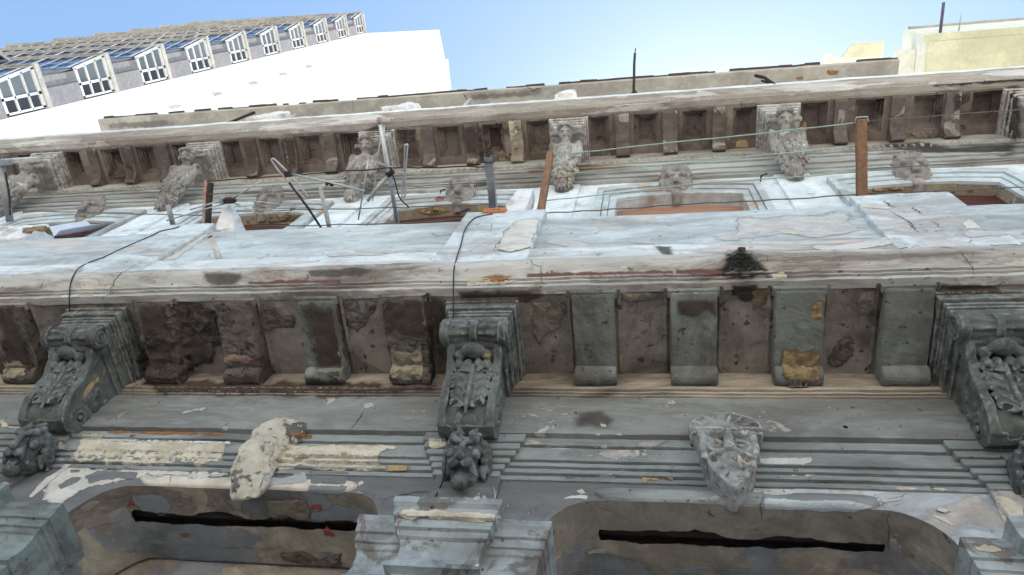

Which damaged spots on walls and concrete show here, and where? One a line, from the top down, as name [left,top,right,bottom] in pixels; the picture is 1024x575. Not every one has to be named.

crack [884,200,974,273]
leakage [205,273,241,285]
peeling [136,301,254,384]
peeling [338,345,424,390]
peeling [781,336,854,387]
leakage [578,412,611,426]
peeling [29,433,231,503]
peeling [397,508,502,532]